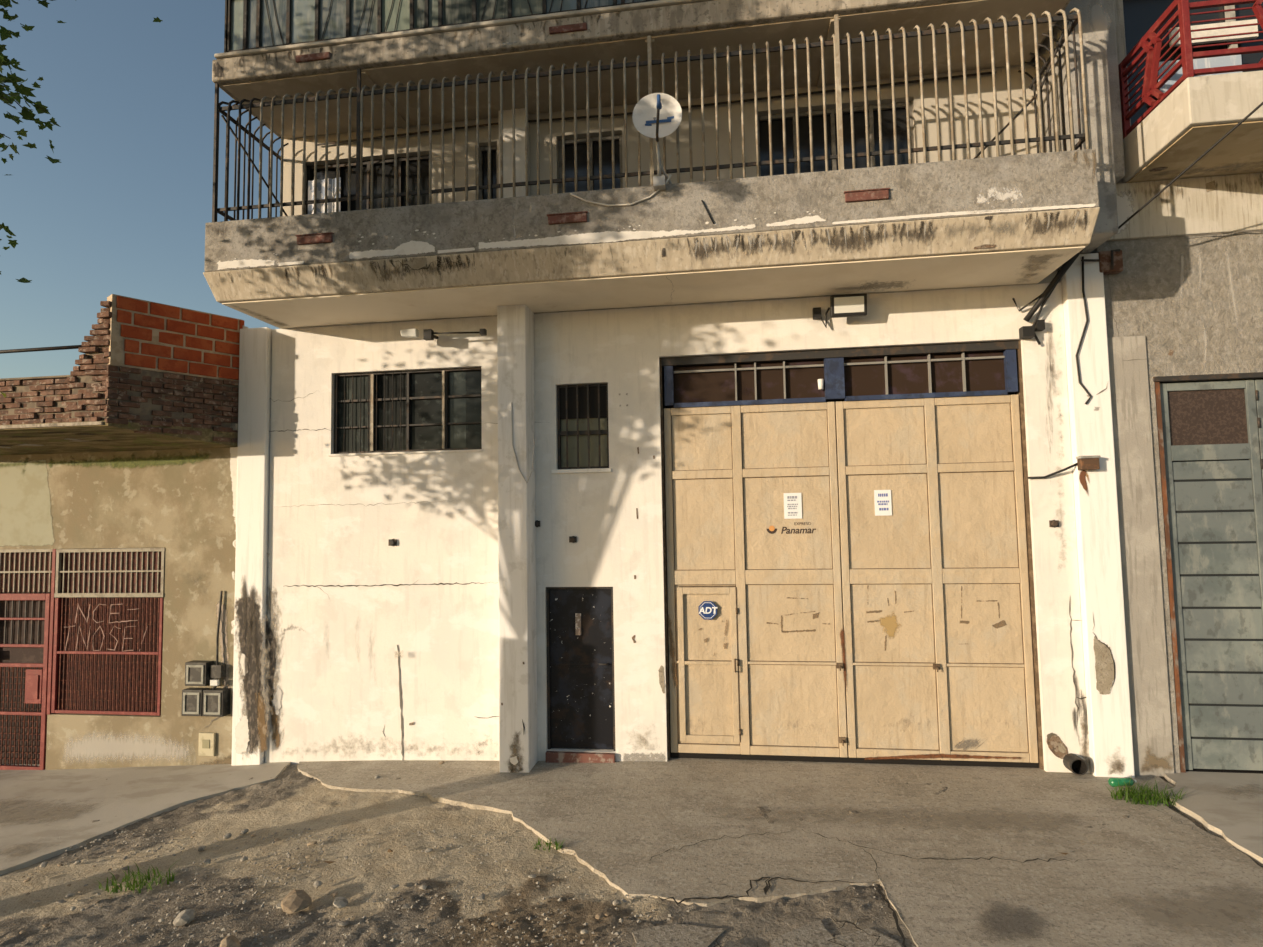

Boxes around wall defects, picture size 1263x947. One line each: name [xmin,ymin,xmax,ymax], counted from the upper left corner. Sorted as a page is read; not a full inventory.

water stain [678,210,1087,259]
water stain [285,266,332,280]
water stain [370,256,469,281]
peeling [866,591,912,651]
water stain [209,580,282,765]
spalling [1093,617,1115,695]